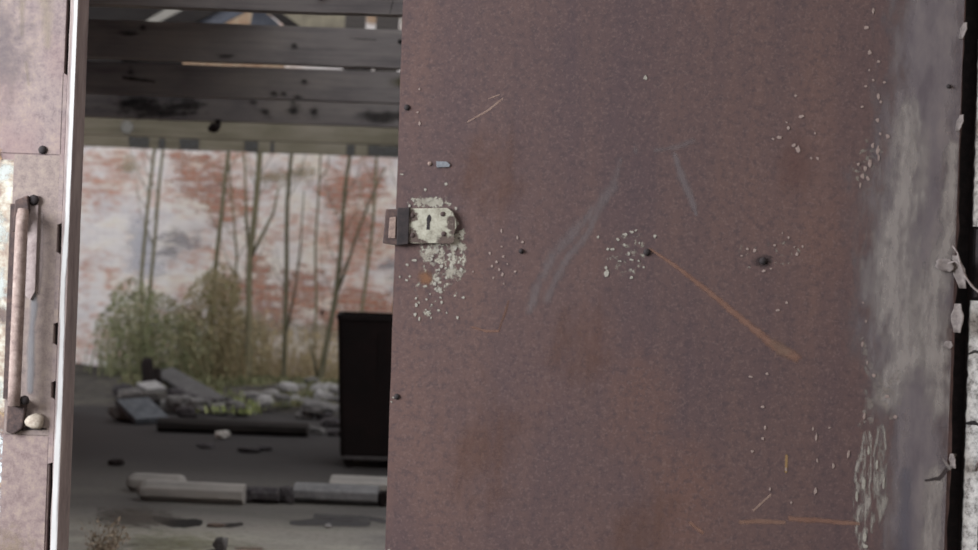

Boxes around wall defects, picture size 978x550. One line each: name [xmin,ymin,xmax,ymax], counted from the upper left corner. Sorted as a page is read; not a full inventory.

peeling [408,188,457,210]
peeling [399,222,474,321]
rust [650,248,799,361]
peeling [847,338,901,549]